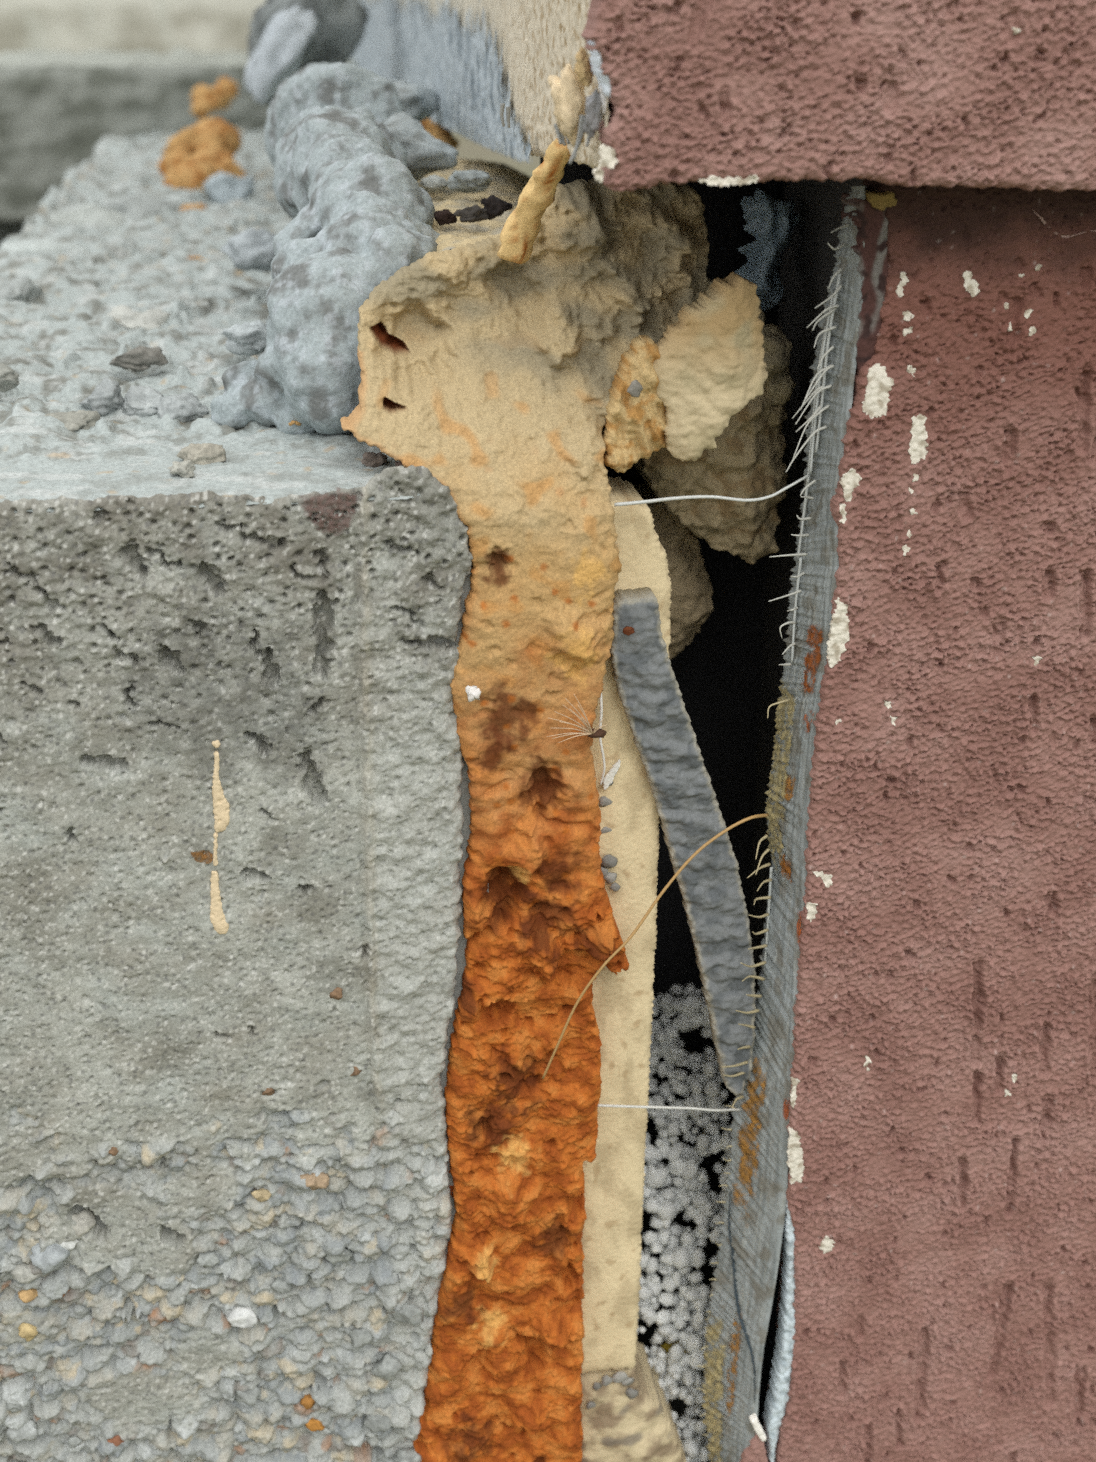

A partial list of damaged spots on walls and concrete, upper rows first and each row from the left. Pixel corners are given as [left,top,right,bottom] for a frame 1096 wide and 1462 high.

peeling [839,468,862,524]
peeling [826,597,850,668]
peeling [812,871,833,888]
peeling [805,902,818,922]
peeling [790,1077,801,1109]
peeling [786,1127,805,1184]
peeling [819,1236,835,1254]
crack [728,1192,796,1462]